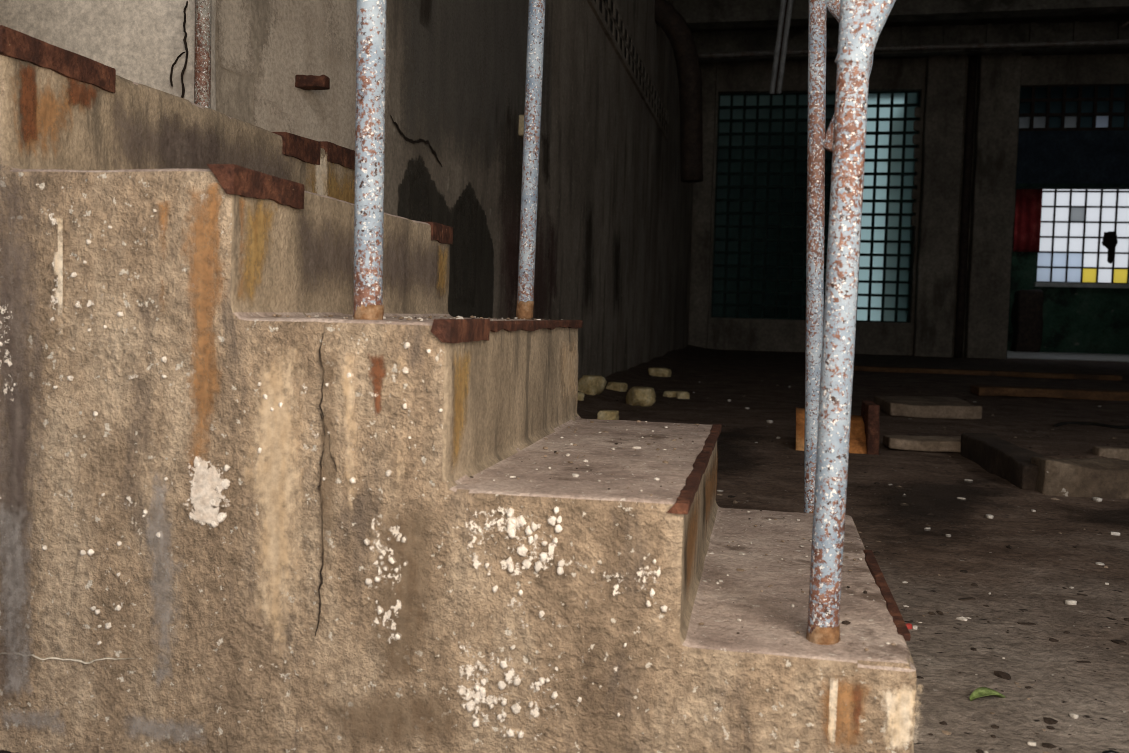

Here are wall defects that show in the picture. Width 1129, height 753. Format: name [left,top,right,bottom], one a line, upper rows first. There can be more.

crack [170,1,188,98]
crack [390,115,442,166]
leakage [0,188,40,693]
leakage [47,204,65,334]
corrosion [186,184,221,465]
corrosion [454,355,470,462]
corrosion [562,342,577,396]
leakage [149,487,171,644]